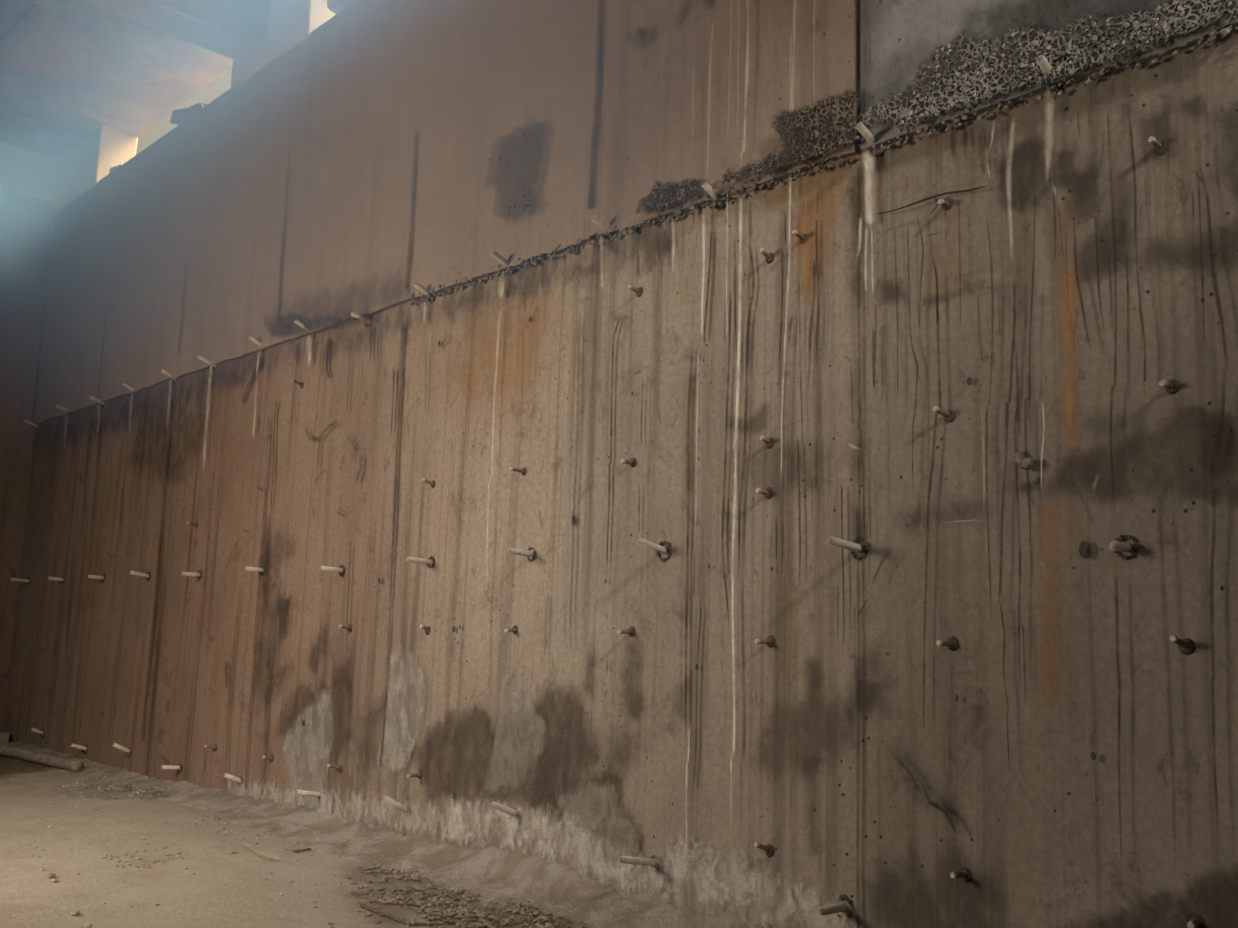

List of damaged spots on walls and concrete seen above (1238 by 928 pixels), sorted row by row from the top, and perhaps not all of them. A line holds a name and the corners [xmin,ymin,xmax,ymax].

damp [607,322,619,558]
damp [859,152,941,725]
damp [419,690,640,855]
damp [1086,869,1238,928]